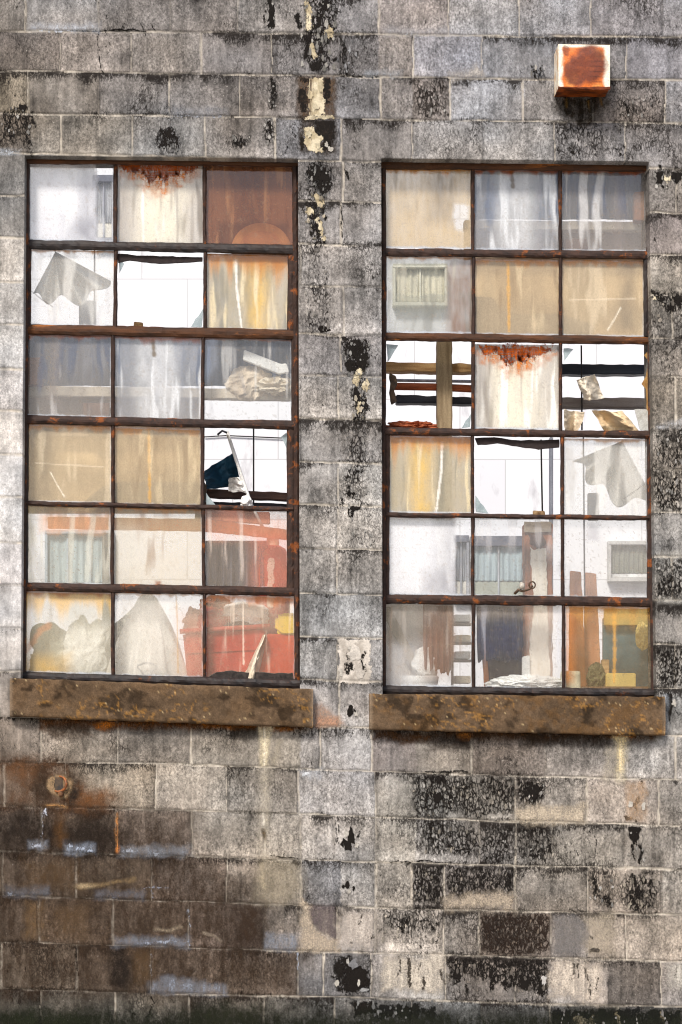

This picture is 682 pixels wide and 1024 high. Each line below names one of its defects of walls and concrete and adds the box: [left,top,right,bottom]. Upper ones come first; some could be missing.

peeling [294,0,357,333]
peeling [339,337,373,559]
peeling [337,638,373,685]
rust [2,758,105,809]
water stain [259,726,280,838]
water stain [0,808,299,1024]